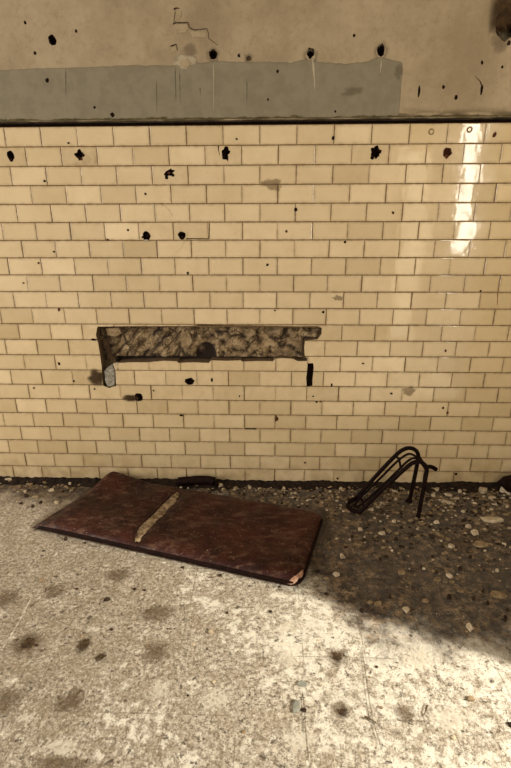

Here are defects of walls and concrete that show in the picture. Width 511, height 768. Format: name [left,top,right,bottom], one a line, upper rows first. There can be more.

crack [171,7,217,53]
peeling [173,54,196,69]
spalling [91,324,321,387]